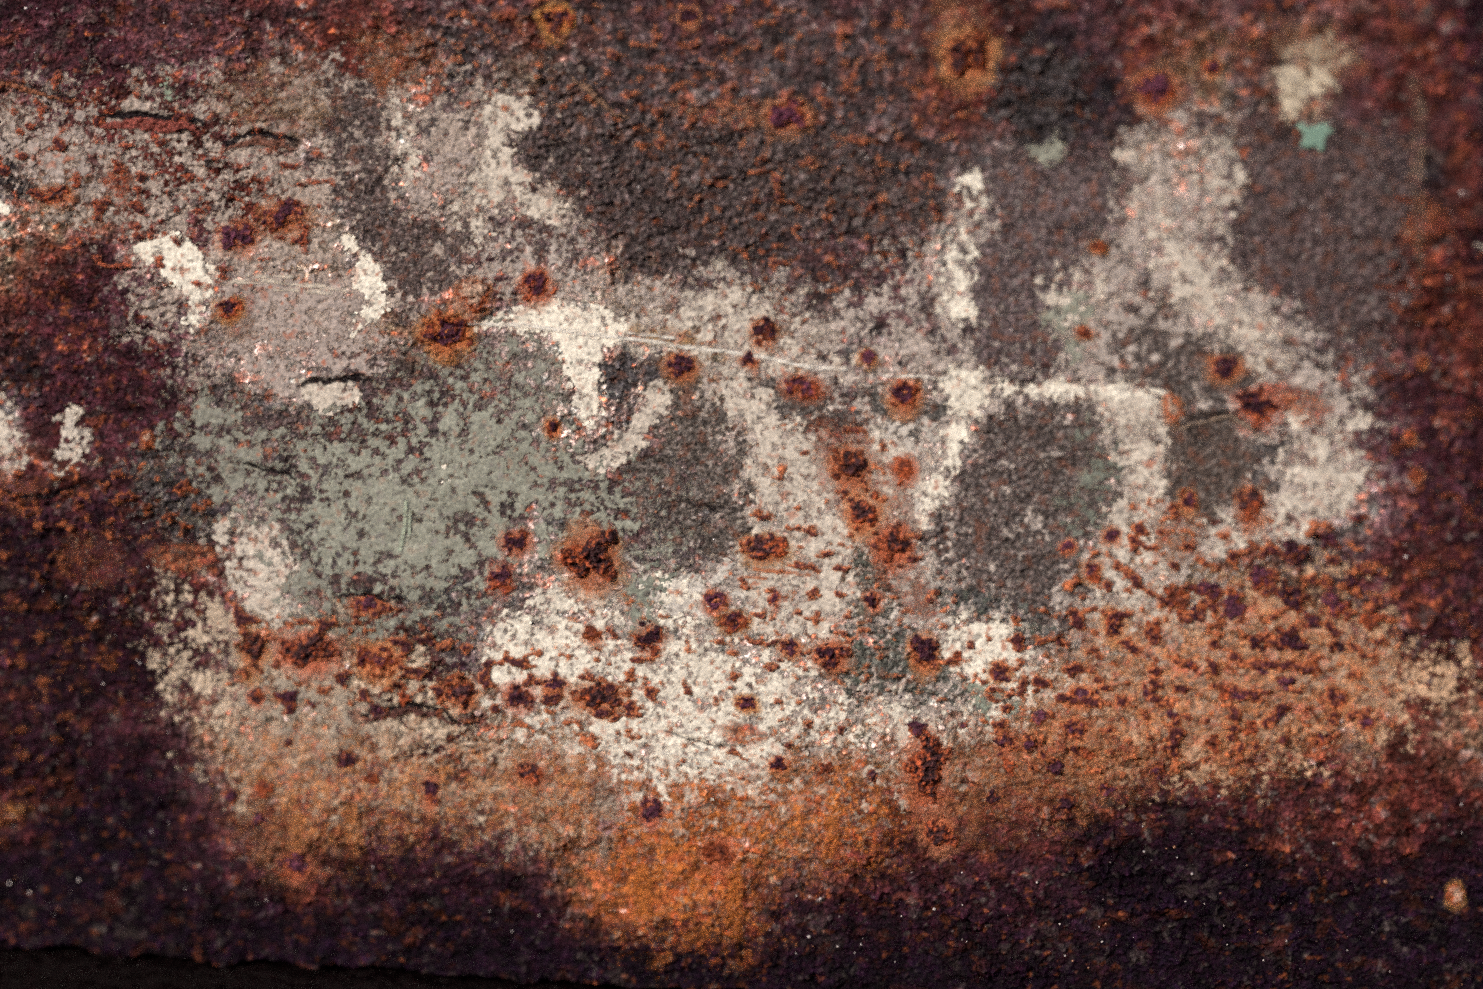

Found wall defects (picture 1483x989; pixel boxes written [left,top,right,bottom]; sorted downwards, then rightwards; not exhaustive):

peeling [269,58,284,82]
rust [931,25,1000,118]
rust [1134,55,1222,106]
rust [604,24,906,292]
rust [889,379,921,414]
peeling [0,382,29,478]
peeling [52,403,97,482]
rust [0,429,217,573]
peeling [1303,550,1352,579]
peeling [394,645,433,669]
peeling [938,752,992,791]
rust [1446,884,1464,905]